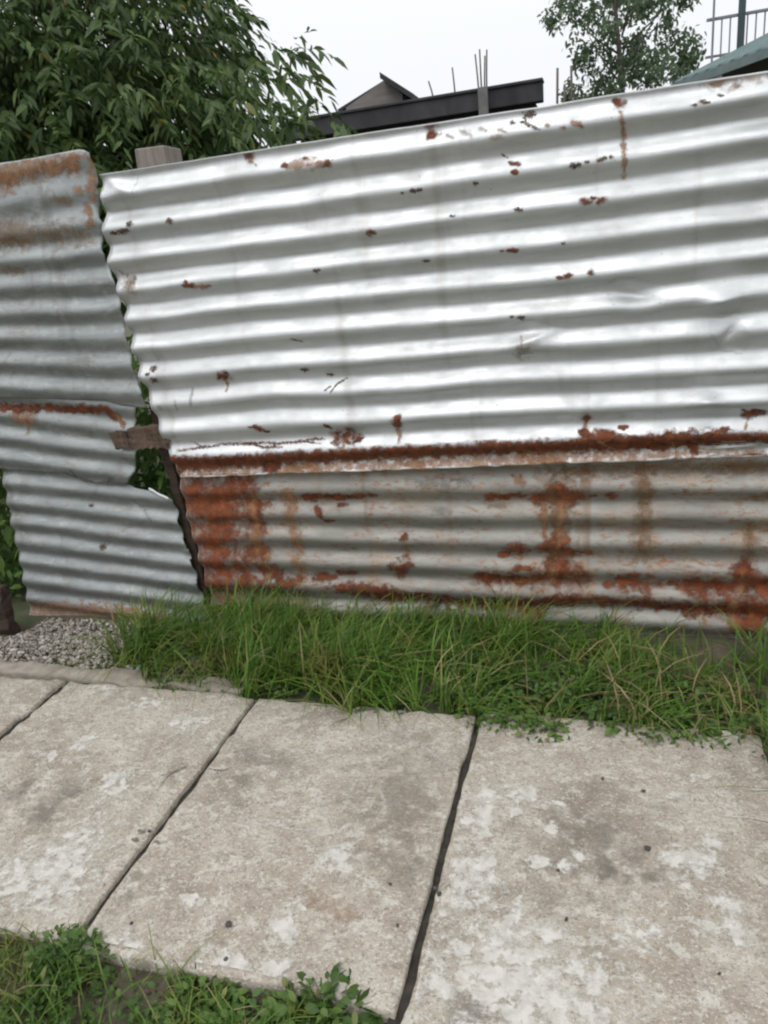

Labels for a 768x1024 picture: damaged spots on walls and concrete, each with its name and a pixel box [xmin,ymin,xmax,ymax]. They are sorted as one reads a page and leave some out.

corrosion [0,152,97,227]
corrosion [280,157,331,169]
corrosion [580,196,606,205]
corrosion [612,98,627,179]
corrosion [0,402,125,433]
corrosion [169,409,768,633]